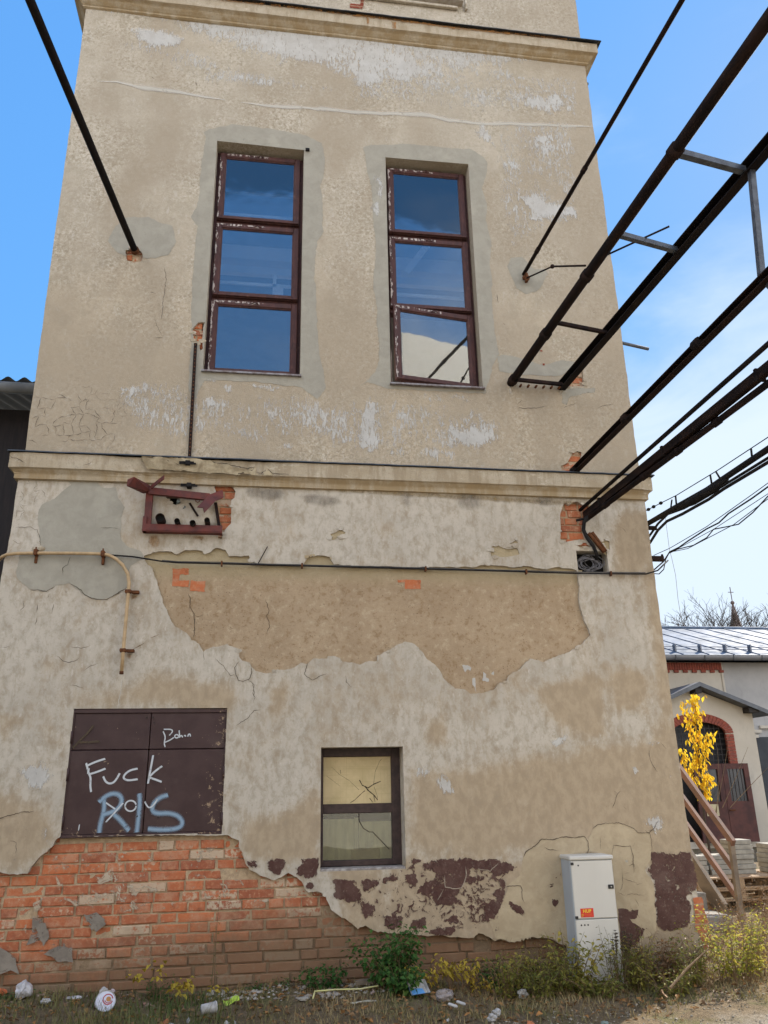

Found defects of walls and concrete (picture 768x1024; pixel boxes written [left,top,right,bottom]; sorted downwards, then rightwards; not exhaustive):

peeling [125,15,580,243]
peeling [121,154,498,462]
crack [11,386,125,545]
flaking render [144,486,589,694]
flaking render [561,450,581,471]
flaking render [558,502,610,556]
crack [188,594,256,724]
flaking render [0,831,568,996]
crack [524,794,656,913]
peeling [618,908,645,947]
peeling [647,851,713,949]